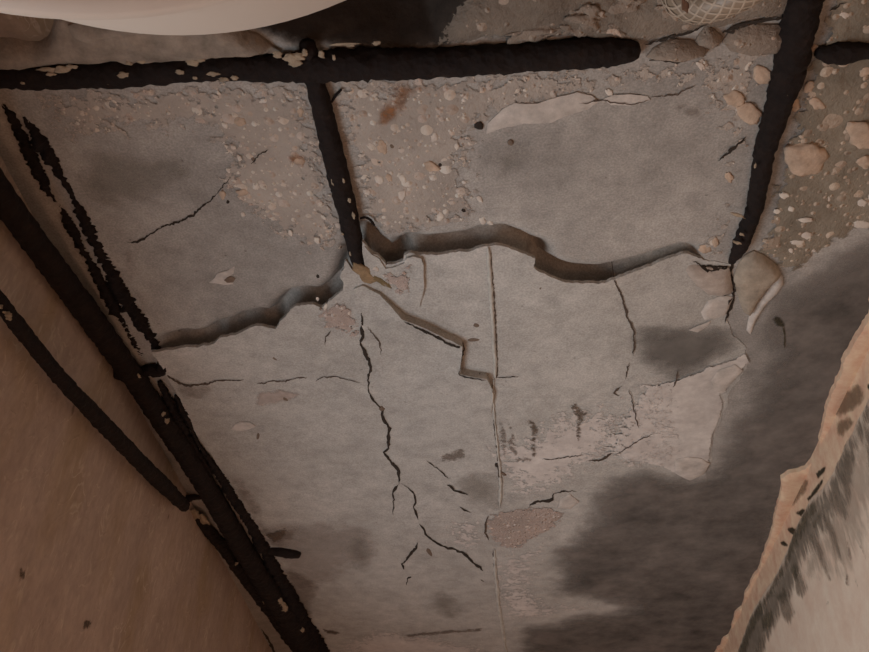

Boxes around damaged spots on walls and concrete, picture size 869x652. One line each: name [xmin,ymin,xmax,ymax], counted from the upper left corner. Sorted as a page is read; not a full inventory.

crack [128,178,230,243]
spalling [34,80,345,255]
peeling [209,266,236,285]
spalling [0,0,787,70]
corrosion [381,89,406,123]
spalling [330,53,771,238]
crack [696,262,736,322]
spalling [746,0,869,334]
crack [167,313,484,585]
damp [487,249,869,652]